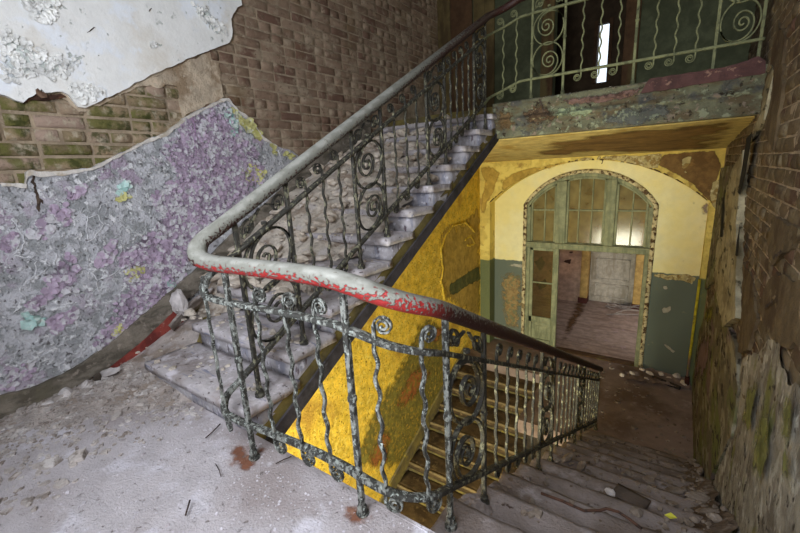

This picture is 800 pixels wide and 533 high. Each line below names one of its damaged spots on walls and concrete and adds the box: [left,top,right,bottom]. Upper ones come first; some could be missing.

water stain [540,123,729,155]
crack [31,176,43,212]
flaking render [0,0,439,351]
flaking render [440,0,800,387]
corrosion [230,446,254,470]